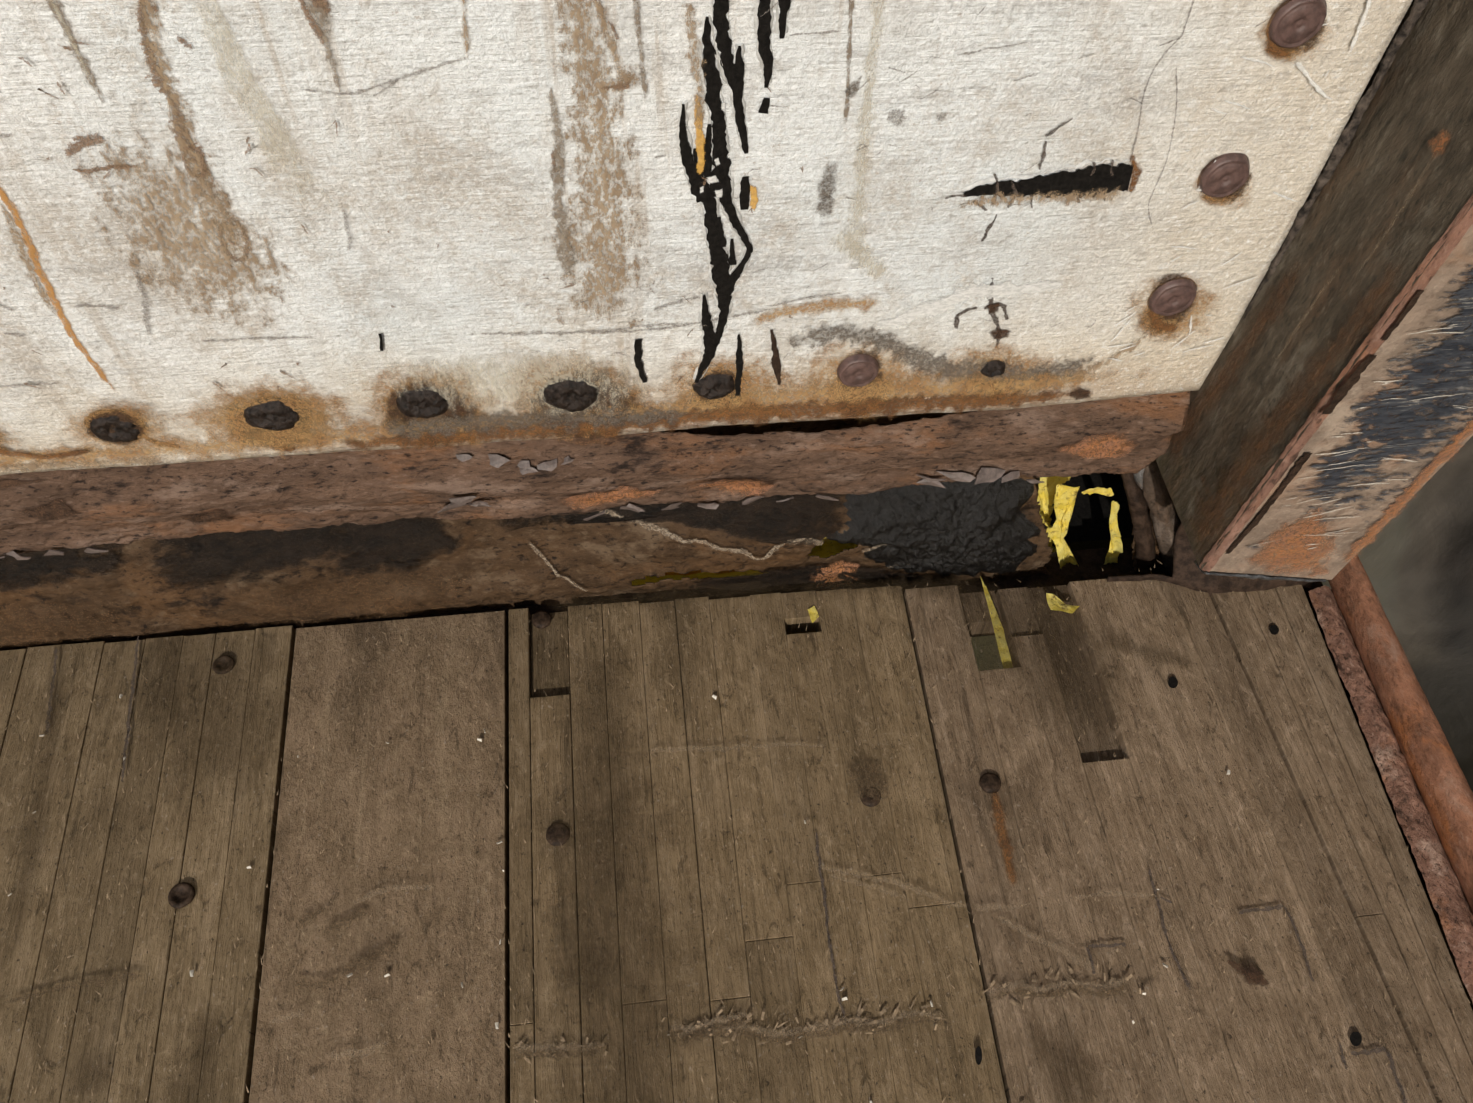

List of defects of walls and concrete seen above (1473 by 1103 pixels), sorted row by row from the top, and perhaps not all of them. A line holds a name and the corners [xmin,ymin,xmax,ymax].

rust [1260,0,1325,59]
leakage [65,132,290,326]
rust [135,0,252,267]
leakage [543,0,654,327]
crack [676,0,792,396]
rust [1203,174,1251,204]
rust [0,187,1094,489]
rust [181,511,233,524]
leakage [330,517,463,576]
rust [437,495,491,513]
rust [564,480,794,521]
rust [1251,421,1473,577]